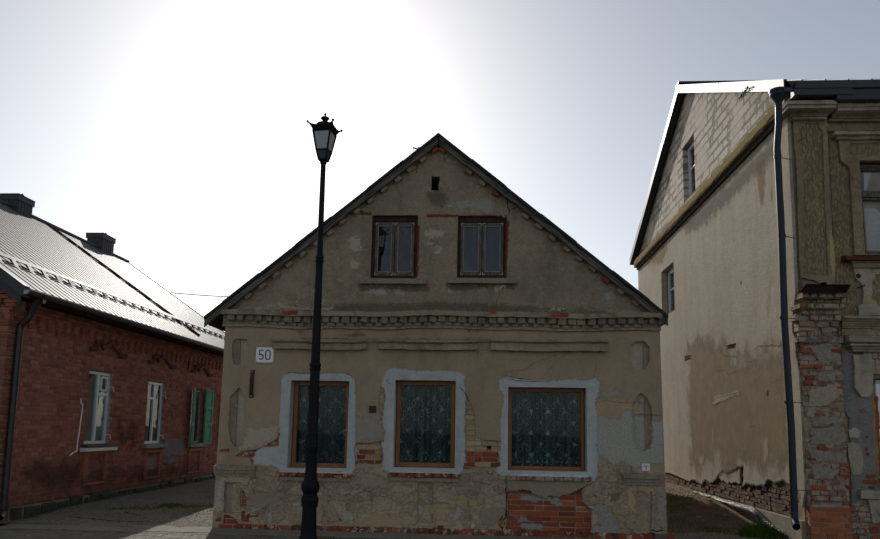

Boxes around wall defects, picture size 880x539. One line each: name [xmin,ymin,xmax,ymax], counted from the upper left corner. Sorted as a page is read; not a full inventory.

damp [687,339,788,472]
flaking render [219,430,280,465]
flaking render [354,441,384,465]
flaking render [463,394,501,470]
flaking render [691,464,789,487]
flaking render [216,490,259,528]
flaking render [498,489,592,534]